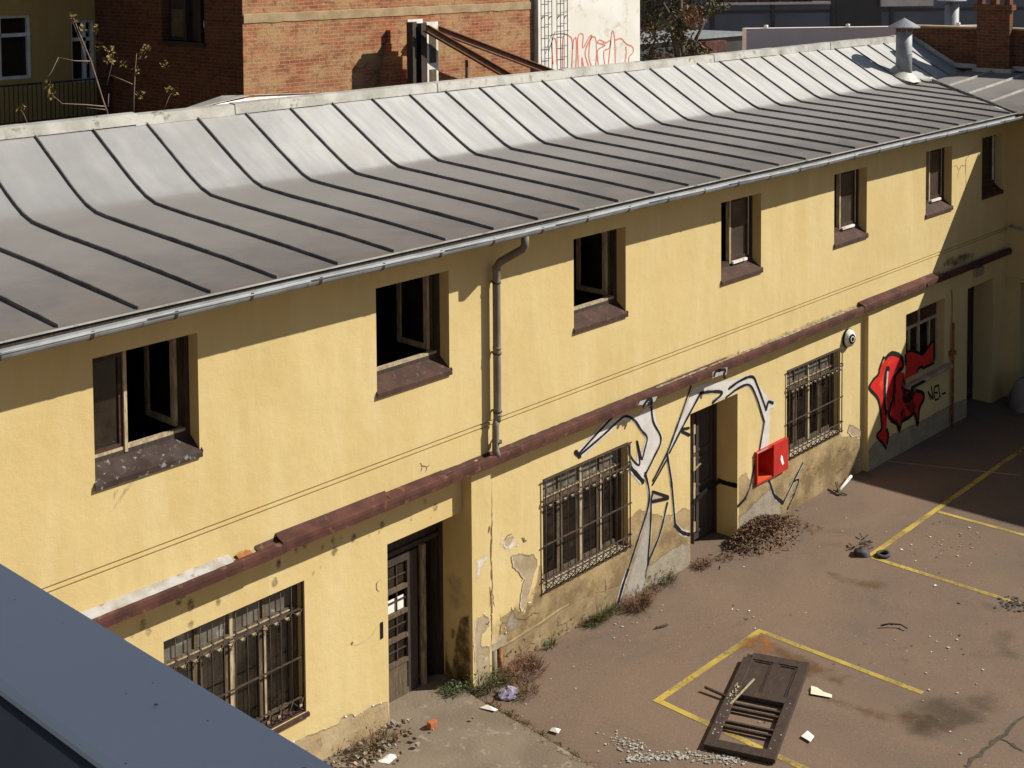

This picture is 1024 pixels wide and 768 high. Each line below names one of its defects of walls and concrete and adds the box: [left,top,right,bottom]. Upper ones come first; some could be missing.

flaking render [474,508,690,685]
flaking render [291,702,389,760]
crack [964,716,1024,767]